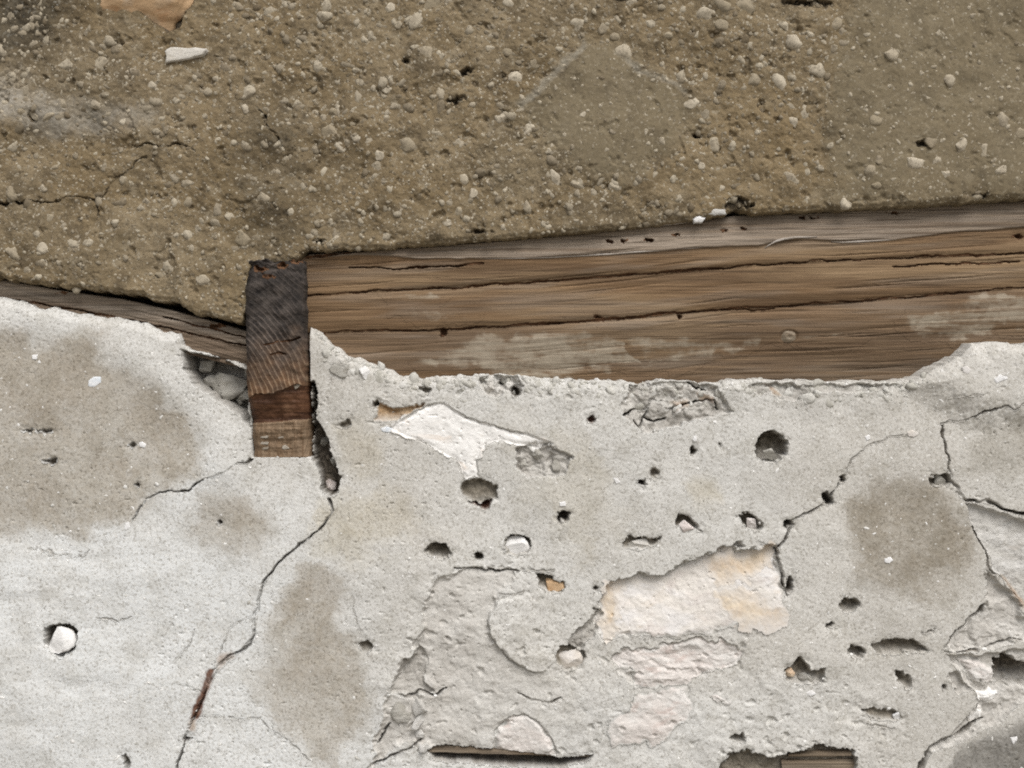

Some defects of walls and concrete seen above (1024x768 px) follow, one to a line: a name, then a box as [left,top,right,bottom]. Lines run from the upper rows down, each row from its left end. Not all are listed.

crack [131,457,253,522]
crack [214,498,334,670]
leakage [237,399,442,768]
spalling [372,402,575,504]
spalling [478,374,525,398]
peeling [367,541,785,768]
crack [757,435,907,597]
leakage [833,407,1024,615]
crack [940,394,1024,612]
crack [941,603,1023,655]
crack [175,715,313,768]
crack [917,716,983,768]